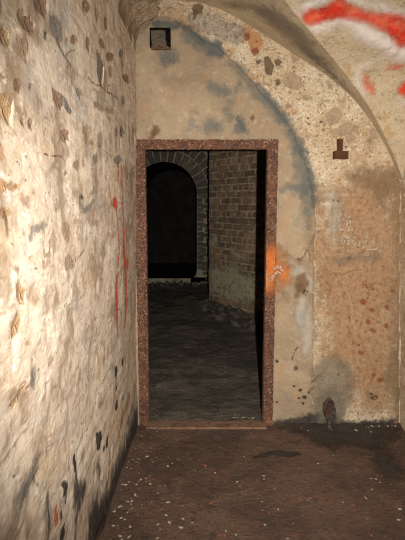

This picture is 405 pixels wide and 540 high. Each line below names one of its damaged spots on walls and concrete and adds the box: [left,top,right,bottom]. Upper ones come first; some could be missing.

damp [153,20,223,57]
damp [257,9,327,69]
damp [241,70,288,123]
damp [281,129,318,228]
rust [266,245,301,292]
damp [273,170,402,480]
damp [62,454,86,524]
damp [89,402,138,540]